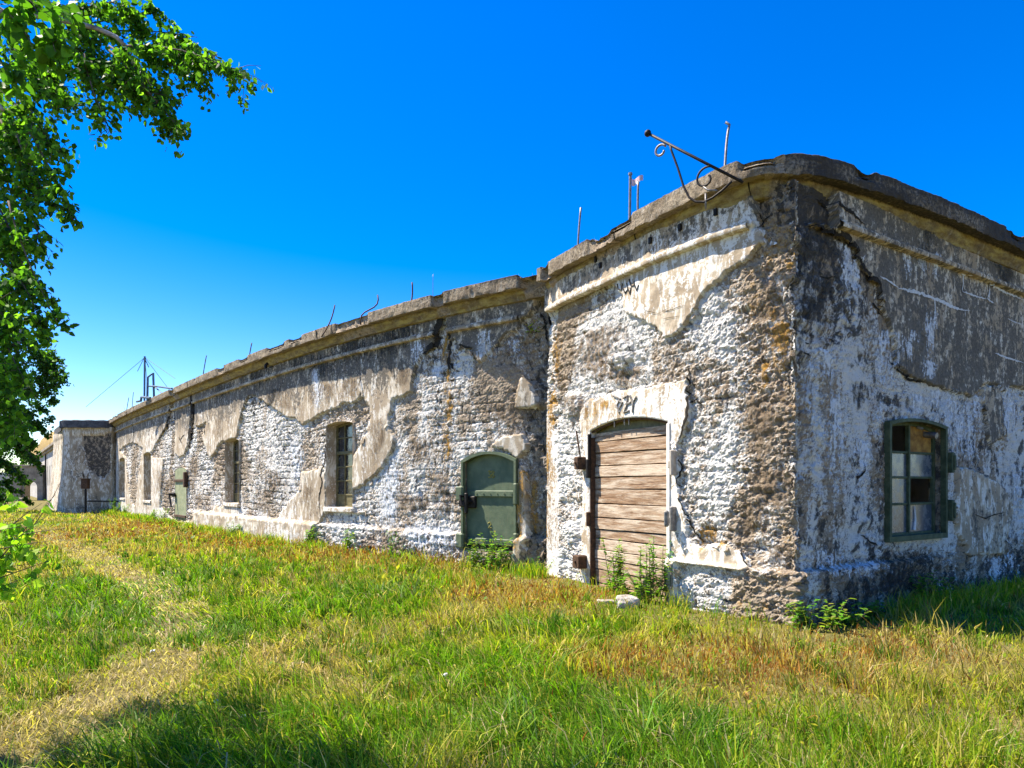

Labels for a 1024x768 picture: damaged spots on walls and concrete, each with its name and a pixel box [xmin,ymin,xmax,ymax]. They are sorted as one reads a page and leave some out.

crack [809,199,1023,325]
spalling [84,390,371,521]
spalling [312,154,1024,626]
leakage [740,391,795,534]
leakage [757,228,985,500]